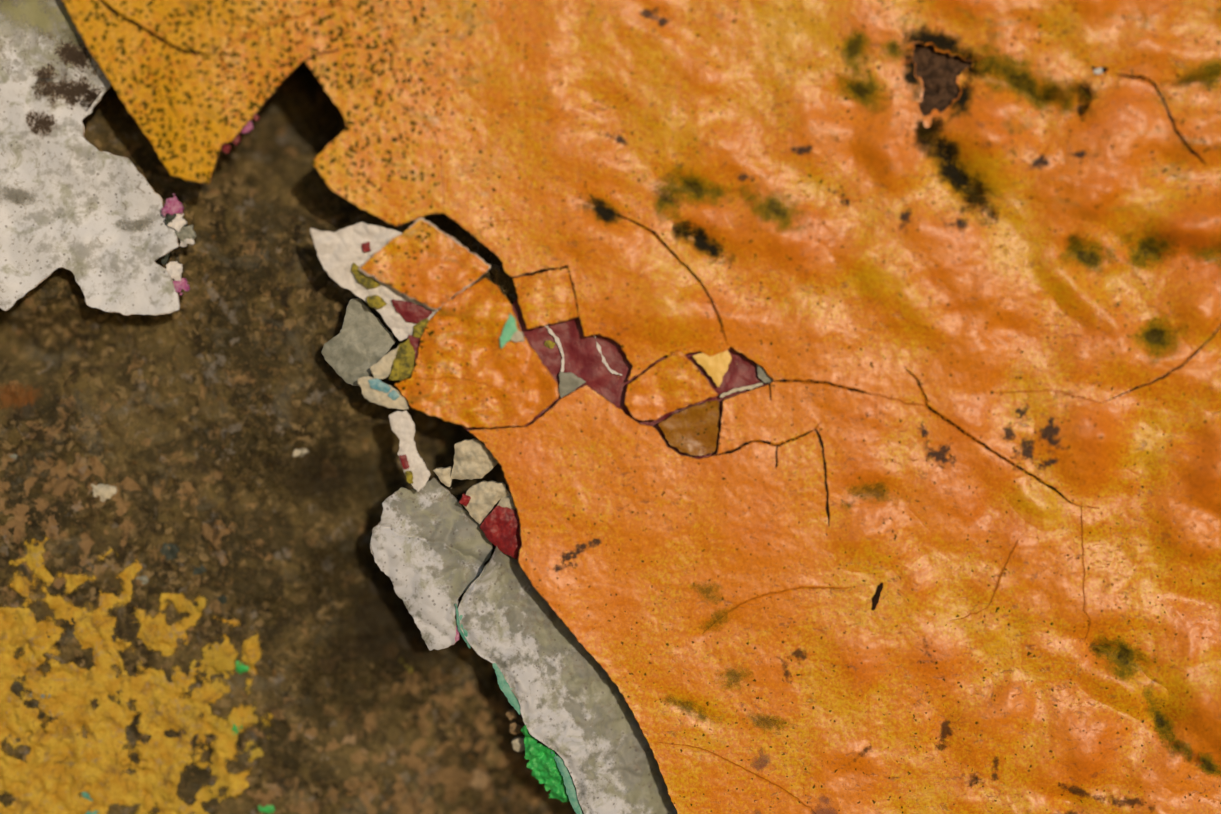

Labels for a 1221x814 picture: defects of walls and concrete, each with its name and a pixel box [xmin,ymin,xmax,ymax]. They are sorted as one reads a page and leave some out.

spalling [913,44,972,116]
crack [1116,74,1206,165]
crack [616,214,728,345]
spalling [0,0,772,814]
crack [994,325,1221,403]
crack [715,421,830,523]
crack [769,369,1100,636]
water stain [969,757,999,787]
water stain [1058,782,1155,811]
water stain [1145,689,1221,775]